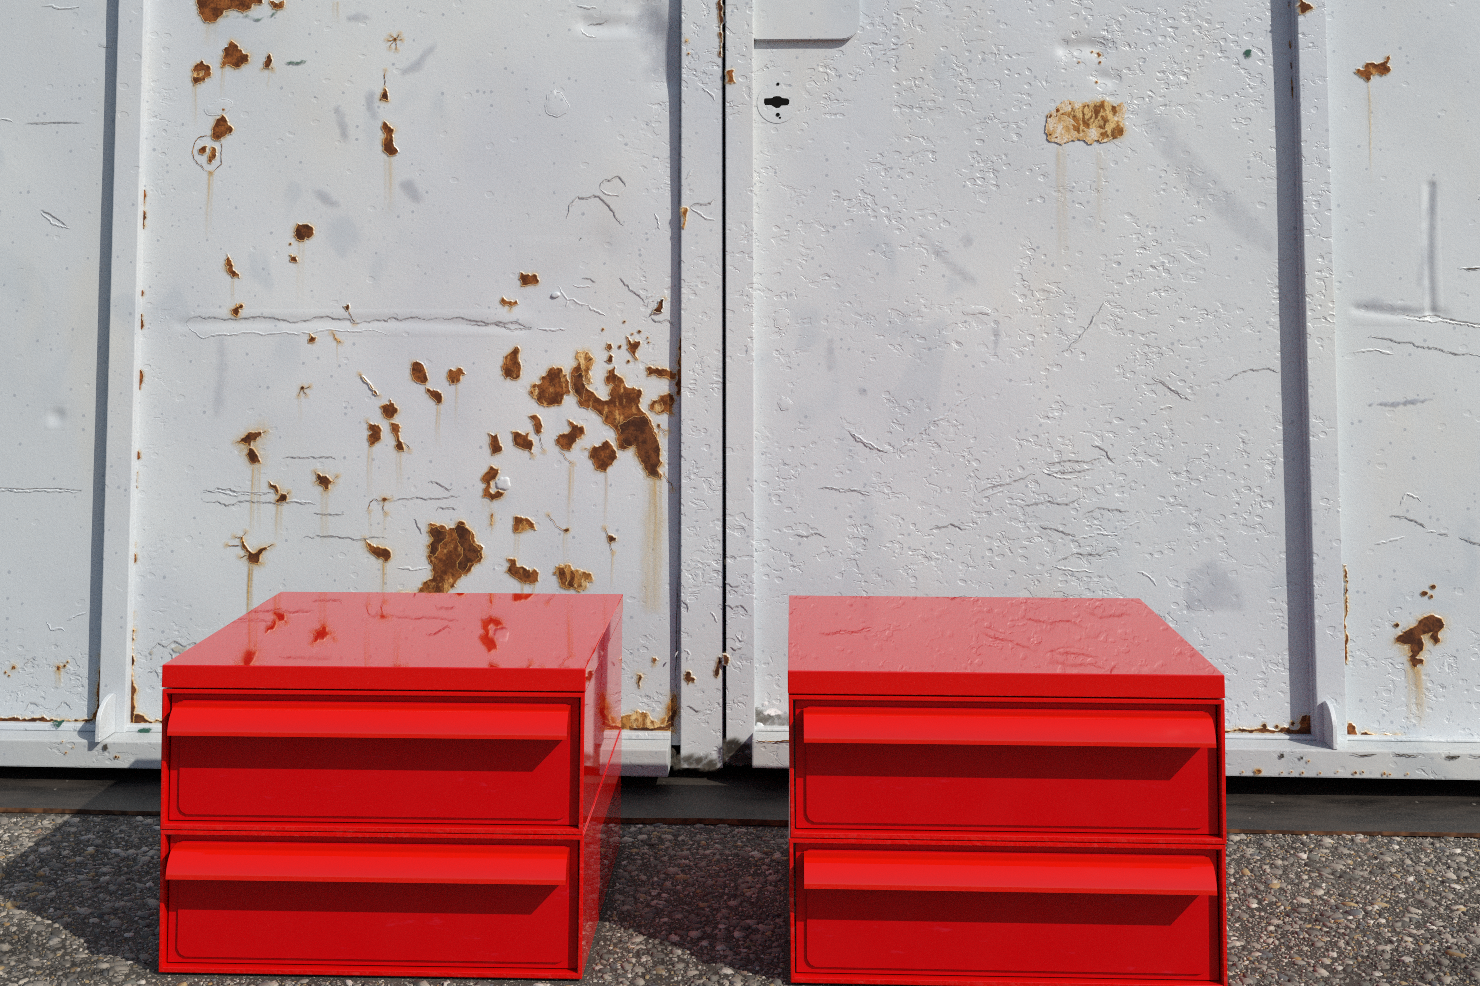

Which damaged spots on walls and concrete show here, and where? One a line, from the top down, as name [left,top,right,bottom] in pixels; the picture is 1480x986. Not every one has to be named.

corrosion [195,0,286,24]
corrosion [191,39,274,86]
corrosion [1354,54,1392,83]
corrosion [192,109,234,182]
corrosion [381,120,400,157]
corrosion [1045,99,1127,145]
corrosion [410,360,466,405]
corrosion [360,374,410,452]
corrosion [480,321,677,525]
corrosion [399,519,485,593]
corrosion [505,557,594,593]
corrosion [1394,585,1446,688]